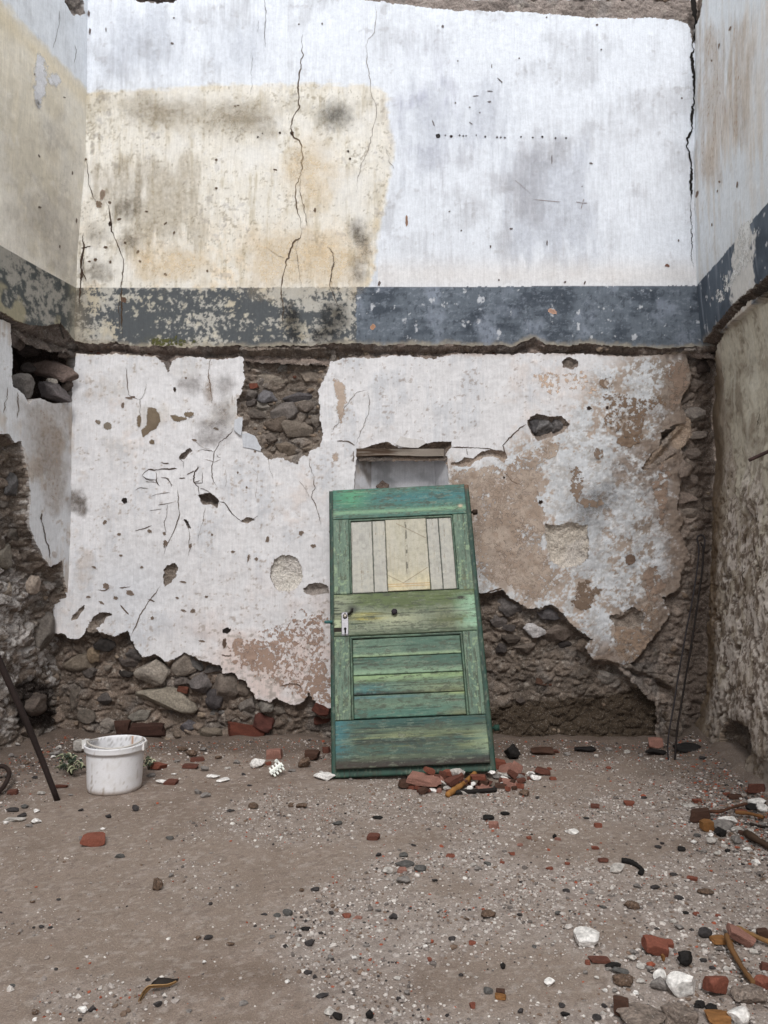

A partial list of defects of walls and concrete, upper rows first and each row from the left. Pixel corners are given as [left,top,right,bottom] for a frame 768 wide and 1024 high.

crack [270,38,307,321]
crack [686,0,698,267]
crack [135,432,273,556]
flaking render [0,216,768,754]